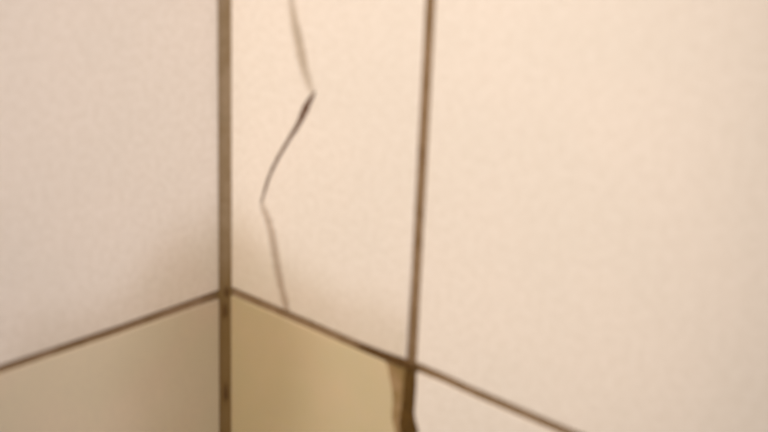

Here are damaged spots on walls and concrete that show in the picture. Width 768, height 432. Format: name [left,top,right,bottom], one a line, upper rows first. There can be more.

crack [261,91,315,203]